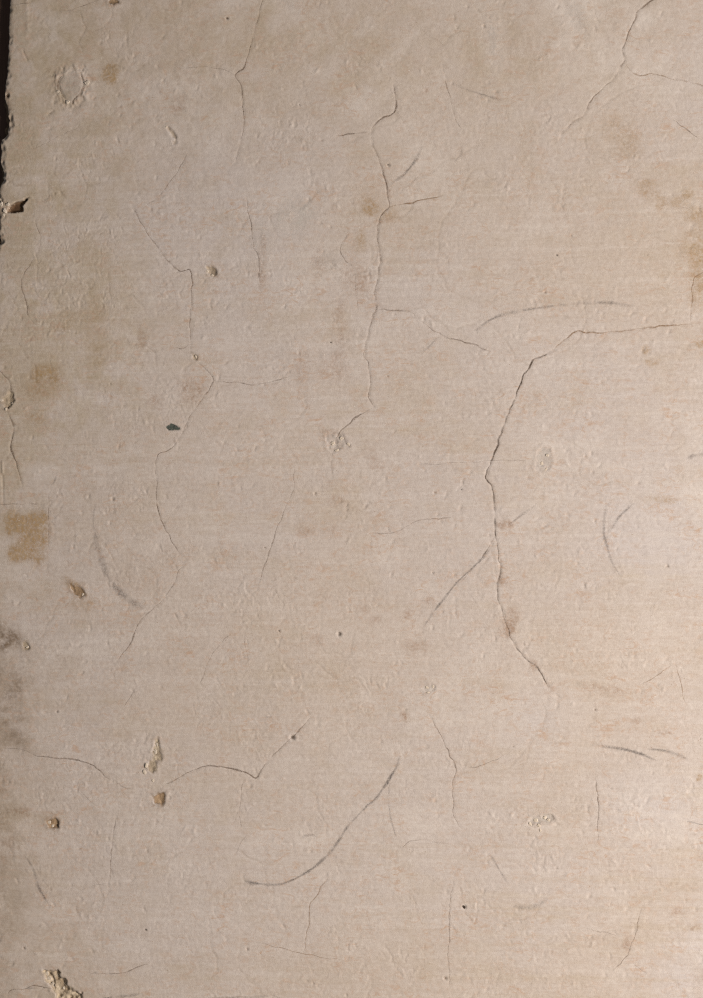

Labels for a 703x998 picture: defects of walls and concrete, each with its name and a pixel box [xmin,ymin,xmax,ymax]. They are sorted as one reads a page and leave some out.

flaking render [154,793,165,806]
flaking render [43,970,82,998]